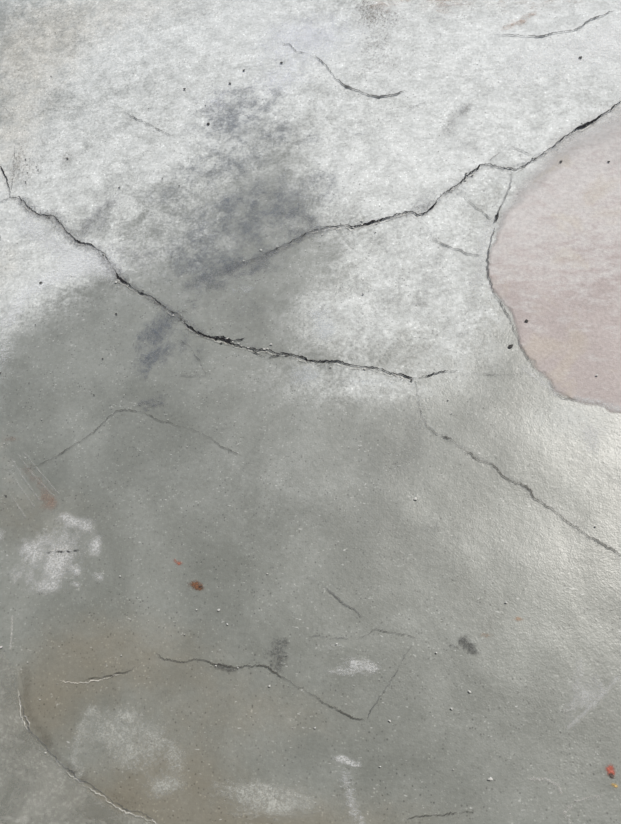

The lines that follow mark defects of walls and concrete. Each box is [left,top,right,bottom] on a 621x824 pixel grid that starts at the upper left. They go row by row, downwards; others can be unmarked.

crack [503,11,612,37]
crack [288,43,405,98]
crack [243,100,621,357]
crack [0,166,457,381]
crack [421,412,617,552]
crack [160,657,281,677]
crack [315,695,373,720]